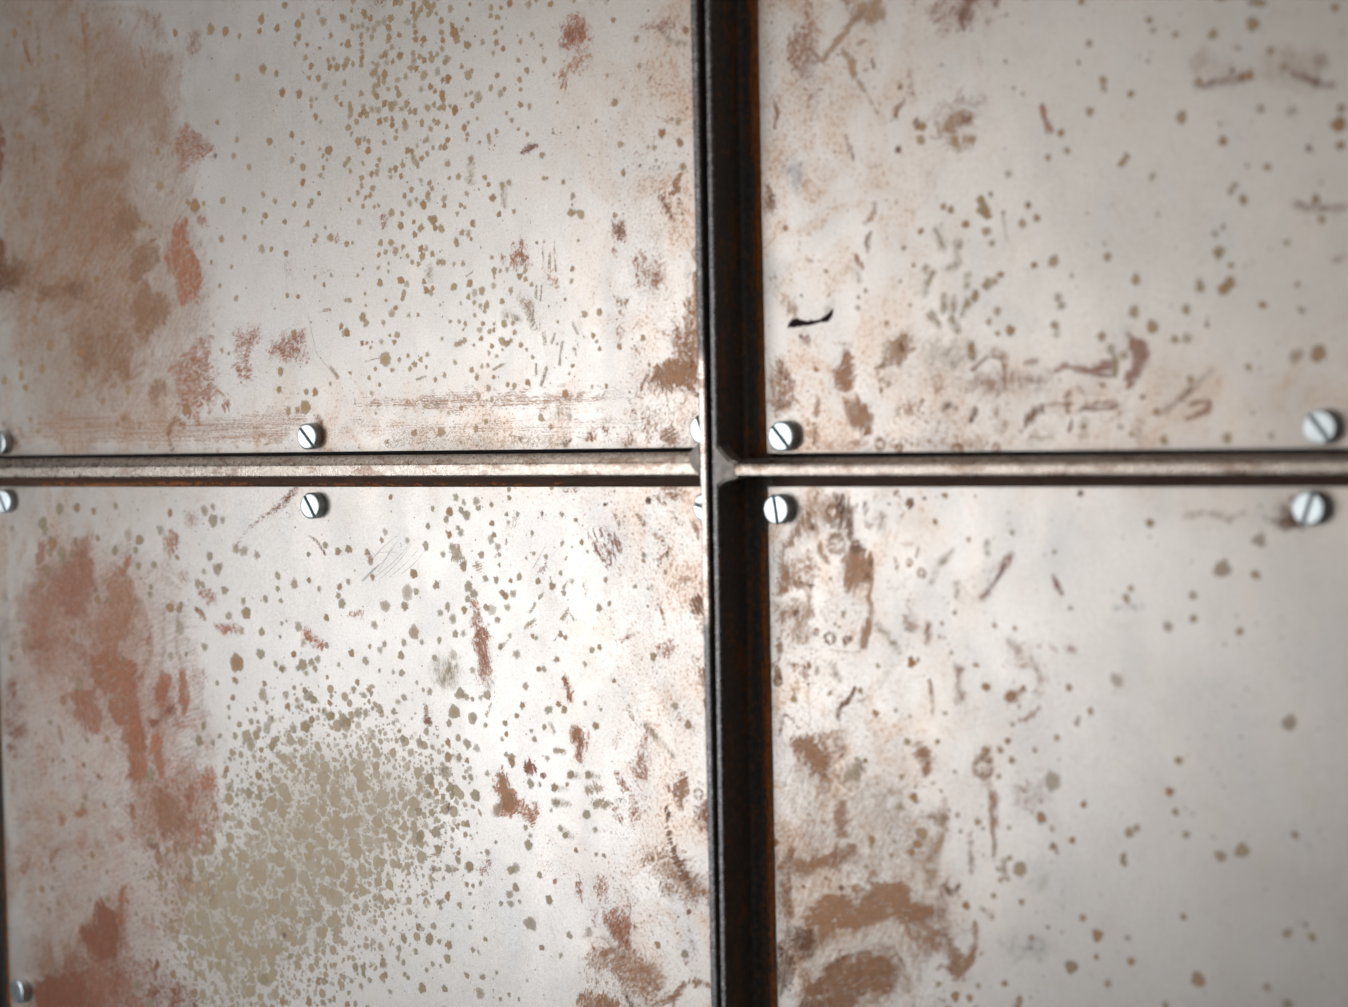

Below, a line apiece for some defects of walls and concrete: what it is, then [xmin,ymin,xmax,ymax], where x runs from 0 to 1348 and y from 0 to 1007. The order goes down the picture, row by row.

corrosion [820,0,905,121]
corrosion [608,217,629,258]
corrosion [354,245,699,448]
crack [788,308,833,328]
corrosion [41,481,563,637]
corrosion [9,503,382,801]
corrosion [398,627,418,676]
corrosion [416,688,491,873]
corrosion [759,487,982,1007]
corrosion [507,865,519,906]
corrosion [305,924,452,1007]
corrosion [576,967,634,1007]